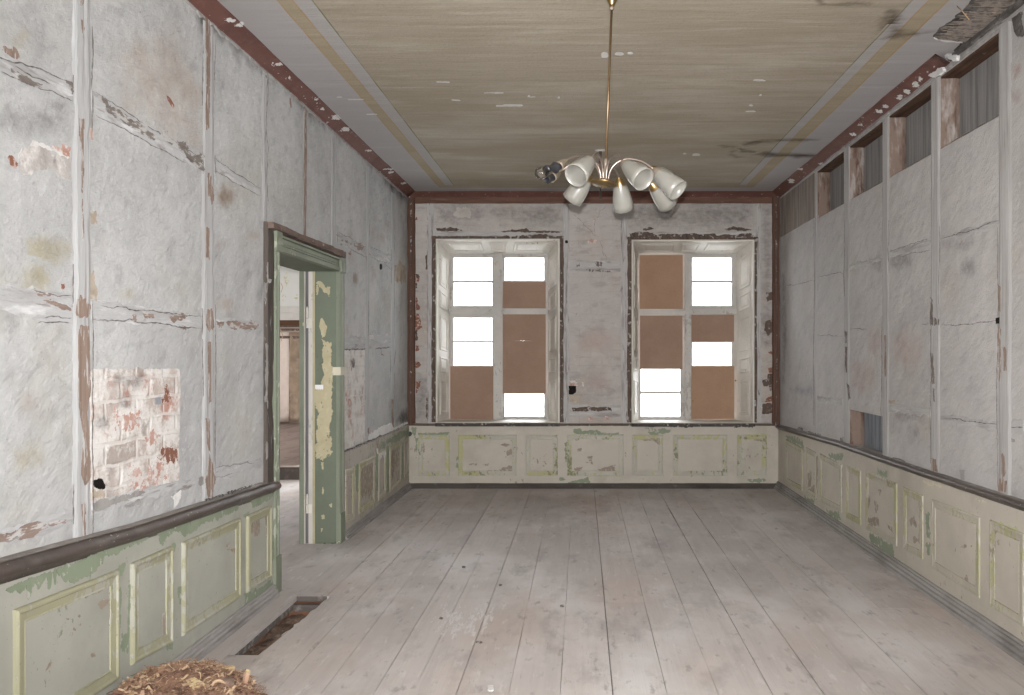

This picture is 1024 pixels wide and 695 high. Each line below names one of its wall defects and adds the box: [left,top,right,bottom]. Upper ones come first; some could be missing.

flaking render [1012,11,1024,37]
peeling [98,95,214,205]
peeling [169,312,186,330]
flaking render [34,270,182,536]
flaking render [315,318,450,500]
peeling [559,406,623,483]
peeling [868,468,894,557]
peeling [909,502,931,555]
peeling [998,453,1007,493]
peeling [0,493,274,654]